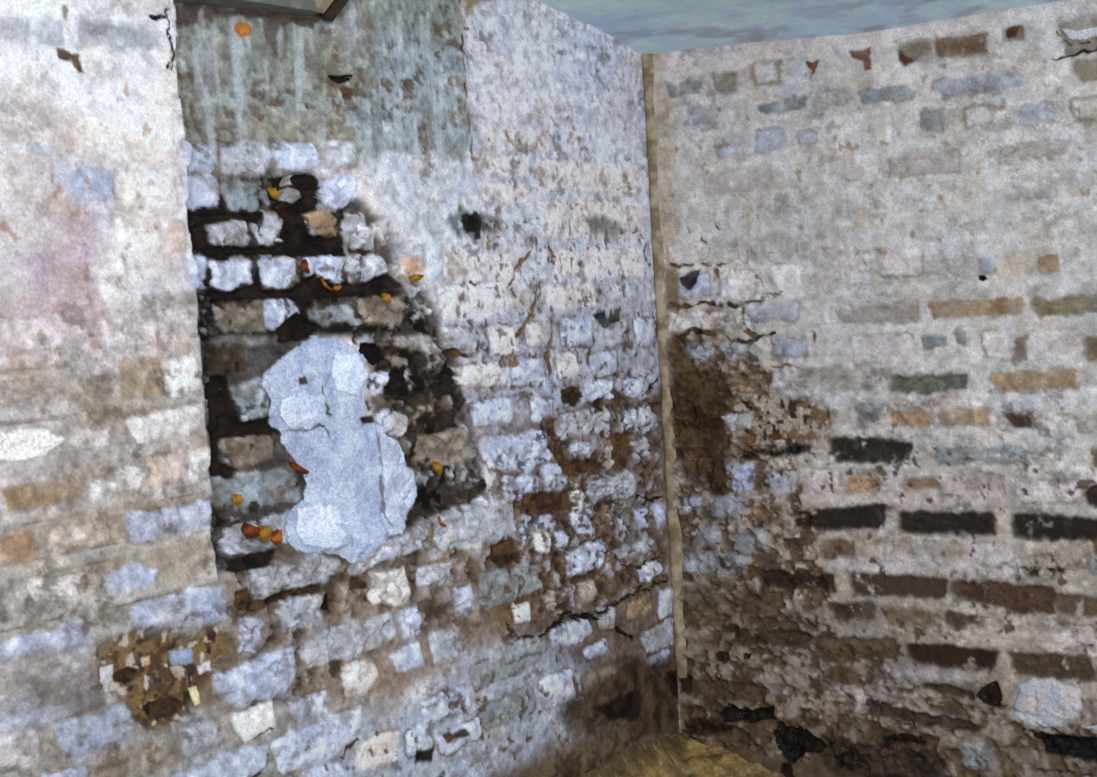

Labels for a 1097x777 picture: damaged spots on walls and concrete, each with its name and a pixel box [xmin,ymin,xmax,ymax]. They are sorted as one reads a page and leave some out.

spalling [187,174,345,257]
spalling [207,273,401,343]
leakage [666,270,679,307]
spalling [204,375,277,479]
spalling [359,343,487,524]
leakage [667,337,730,493]
crack [635,494,661,503]
spalling [235,584,328,611]
crack [506,552,667,640]
spalling [97,627,231,731]
leakage [780,761,794,777]
leakage [825,733,947,777]